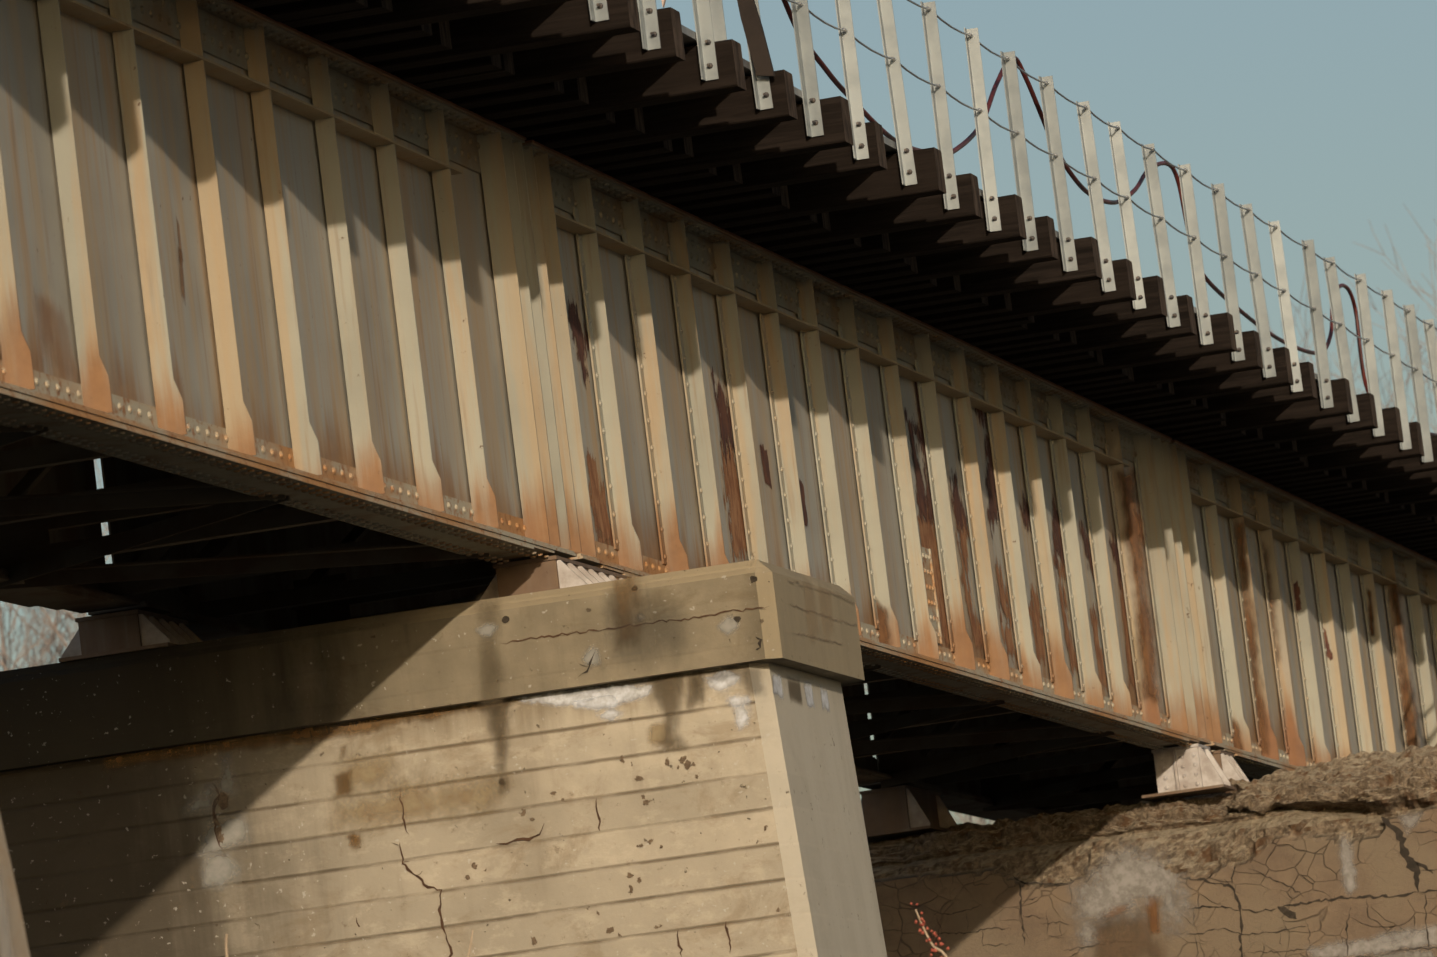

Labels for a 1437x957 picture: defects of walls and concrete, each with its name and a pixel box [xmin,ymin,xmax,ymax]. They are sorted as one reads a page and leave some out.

corrosion [587,447,614,547]
corrosion [720,442,748,562]
crack [503,578,858,674]
corrosion [917,504,950,649]
corrosion [1028,584,1046,668]
corrosion [1089,604,1108,693]
corrosion [1117,471,1159,701]
water stain [492,671,748,762]
crack [212,783,226,857]
crack [393,789,453,957]
spalling [1278,906,1297,919]
crack [1147,815,1437,957]